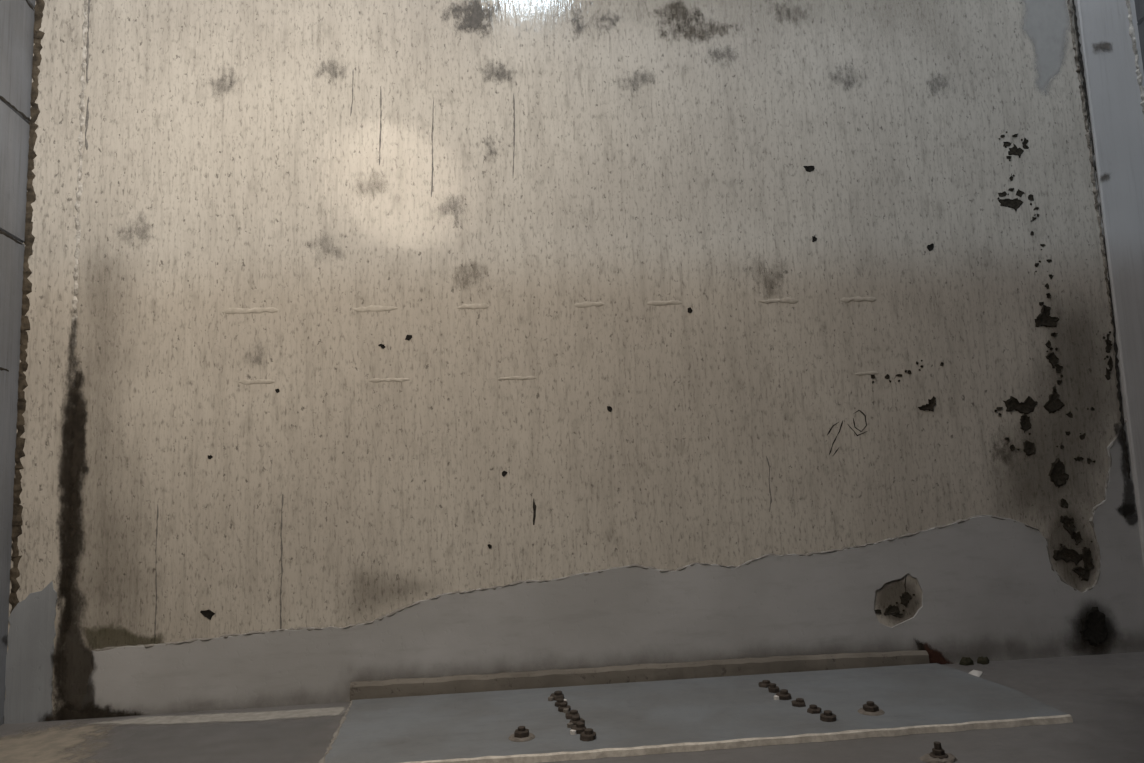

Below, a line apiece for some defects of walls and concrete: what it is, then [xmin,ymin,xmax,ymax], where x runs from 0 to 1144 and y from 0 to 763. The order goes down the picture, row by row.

leakage [656,2,725,40]
leakage [43,319,140,721]
peeling [90,131,1144,719]
leakage [1074,605,1116,655]